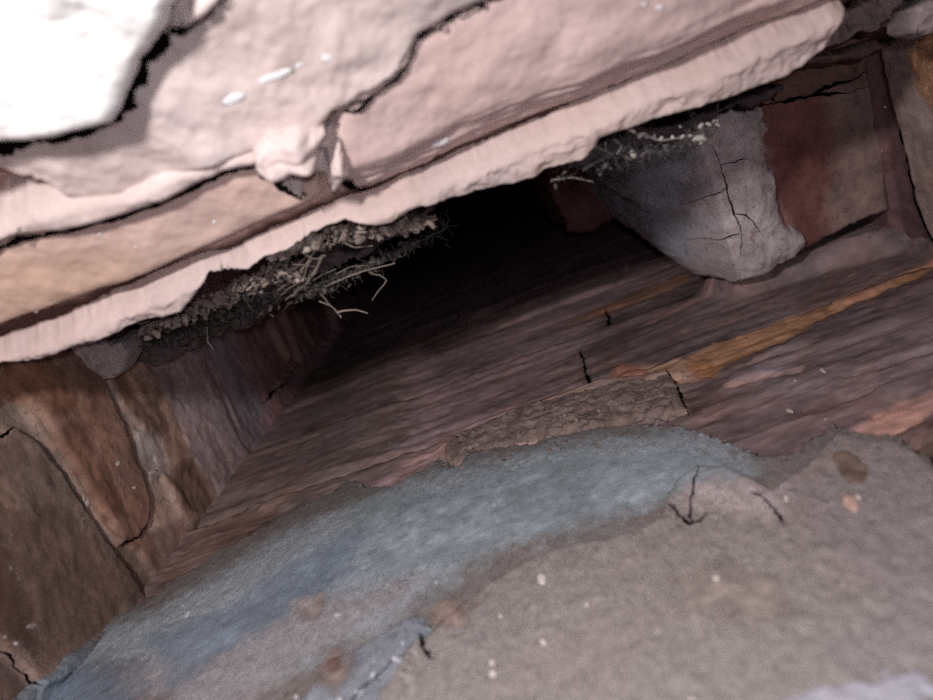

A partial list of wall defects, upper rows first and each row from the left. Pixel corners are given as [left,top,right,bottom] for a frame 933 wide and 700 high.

peeling [0,0,220,141]
crack [324,0,492,134]
crack [754,72,868,107]
crack [680,146,763,254]
crack [0,651,43,686]